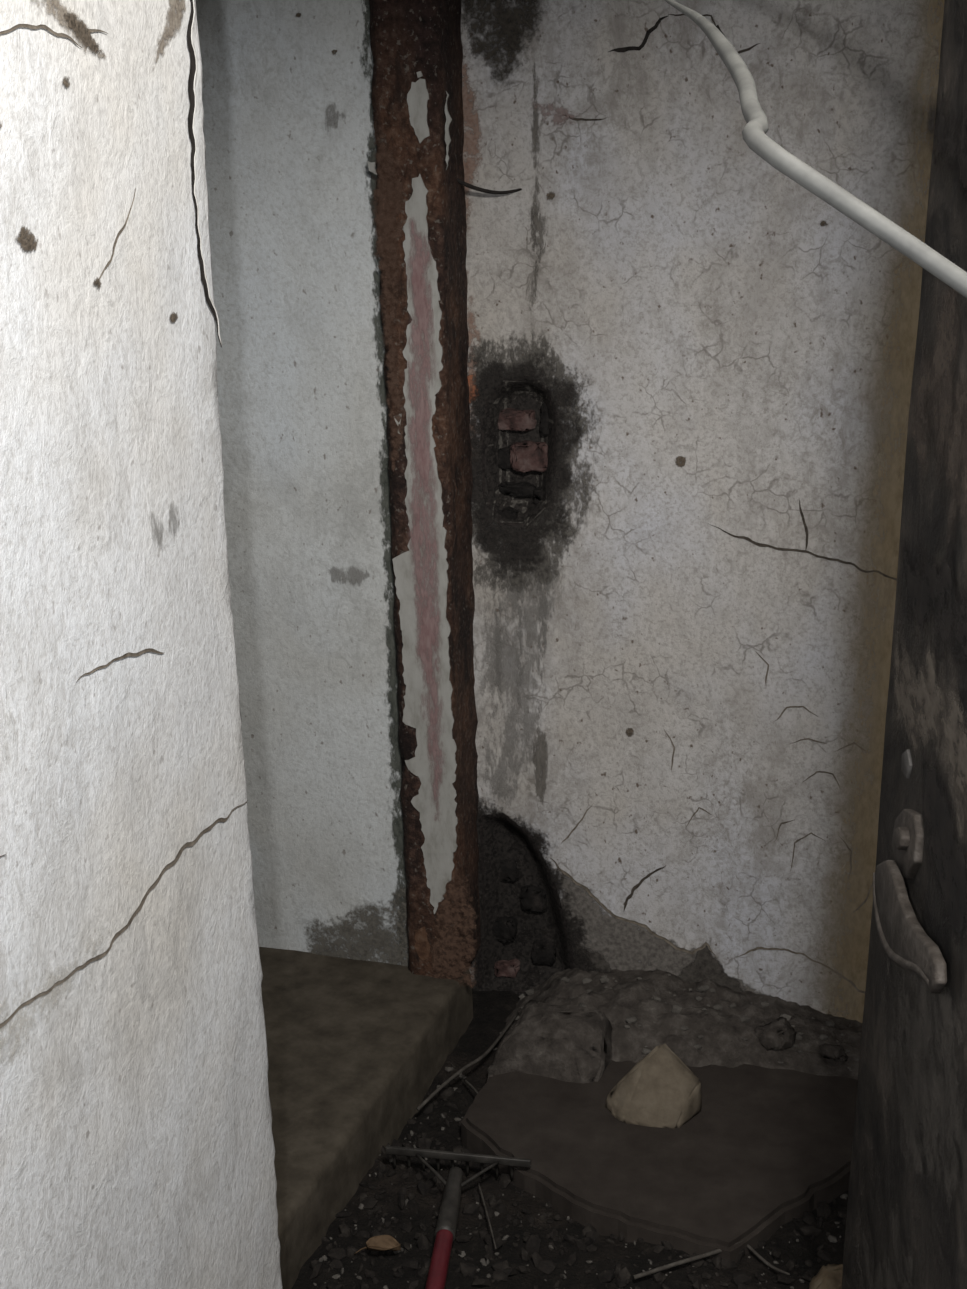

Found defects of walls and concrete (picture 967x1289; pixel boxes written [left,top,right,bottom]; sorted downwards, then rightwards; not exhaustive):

crack [609,14,760,53]
crack [187,0,222,348]
rust [462,63,482,221]
rust [373,126,405,471]
rust [467,308,480,449]
spalling [480,375,556,527]
crack [708,500,897,581]
crack [76,648,163,682]
crack [0,800,248,1028]
rust [431,878,476,987]